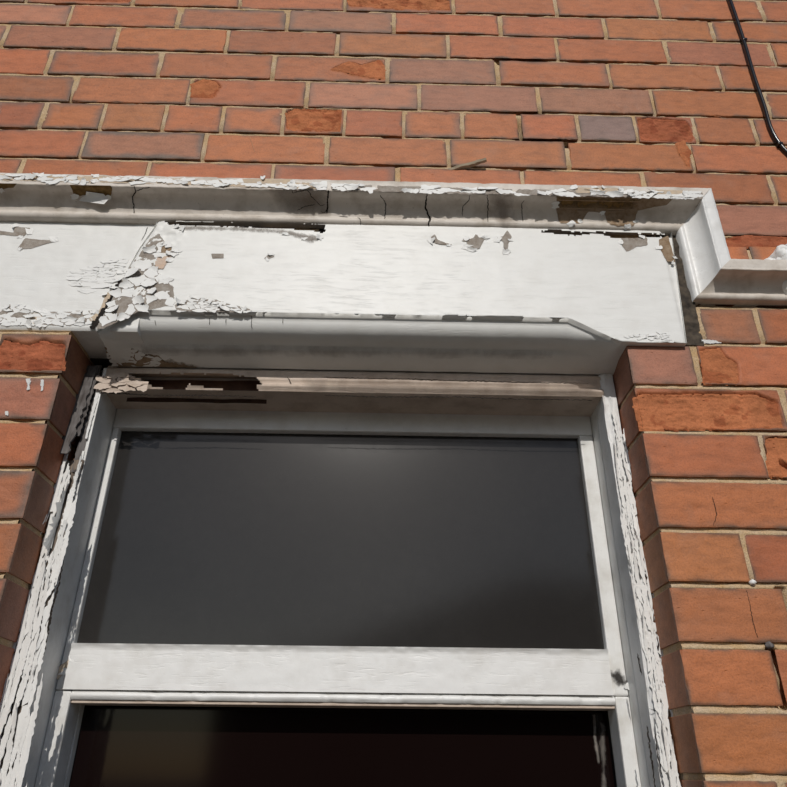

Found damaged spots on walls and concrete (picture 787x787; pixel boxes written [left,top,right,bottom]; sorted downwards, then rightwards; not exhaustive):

spalling [347,0,450,11]
spalling [285,108,342,132]
spalling [637,118,693,167]
crack [291,189,361,225]
peeling [0,172,705,264]
crack [89,279,122,329]
peeling [0,234,251,329]
spalling [0,340,66,374]
peeling [94,345,197,394]
spalling [632,348,787,479]
peeling [0,455,82,787]